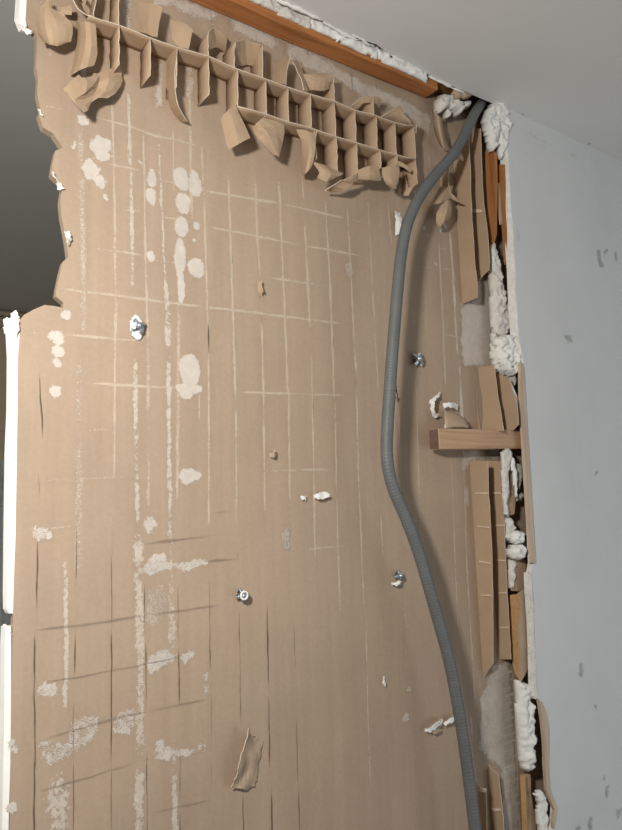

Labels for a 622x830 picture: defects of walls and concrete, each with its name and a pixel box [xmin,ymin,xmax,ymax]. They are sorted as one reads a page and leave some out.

spalling [248,0,464,93]